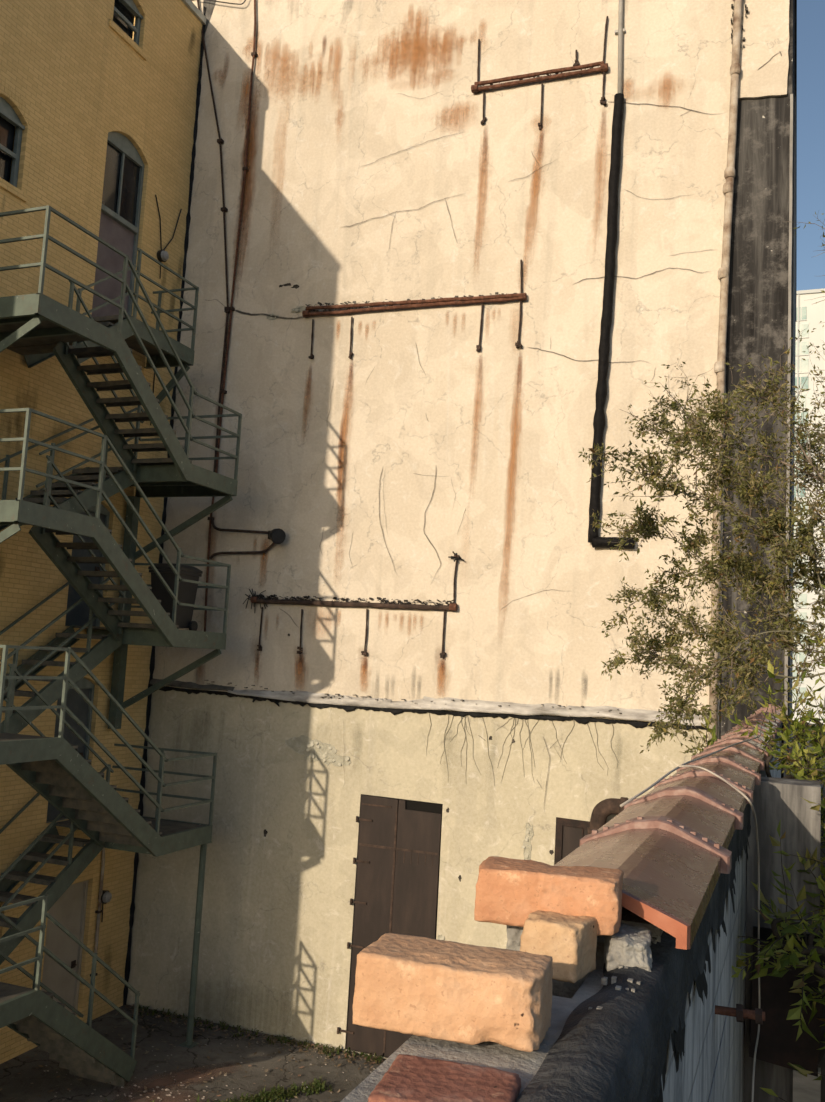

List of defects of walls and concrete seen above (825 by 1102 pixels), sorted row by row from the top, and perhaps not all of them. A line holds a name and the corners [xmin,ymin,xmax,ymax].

rust [240,120,254,223]
rust [339,405,348,500]
rust [508,407,517,509]